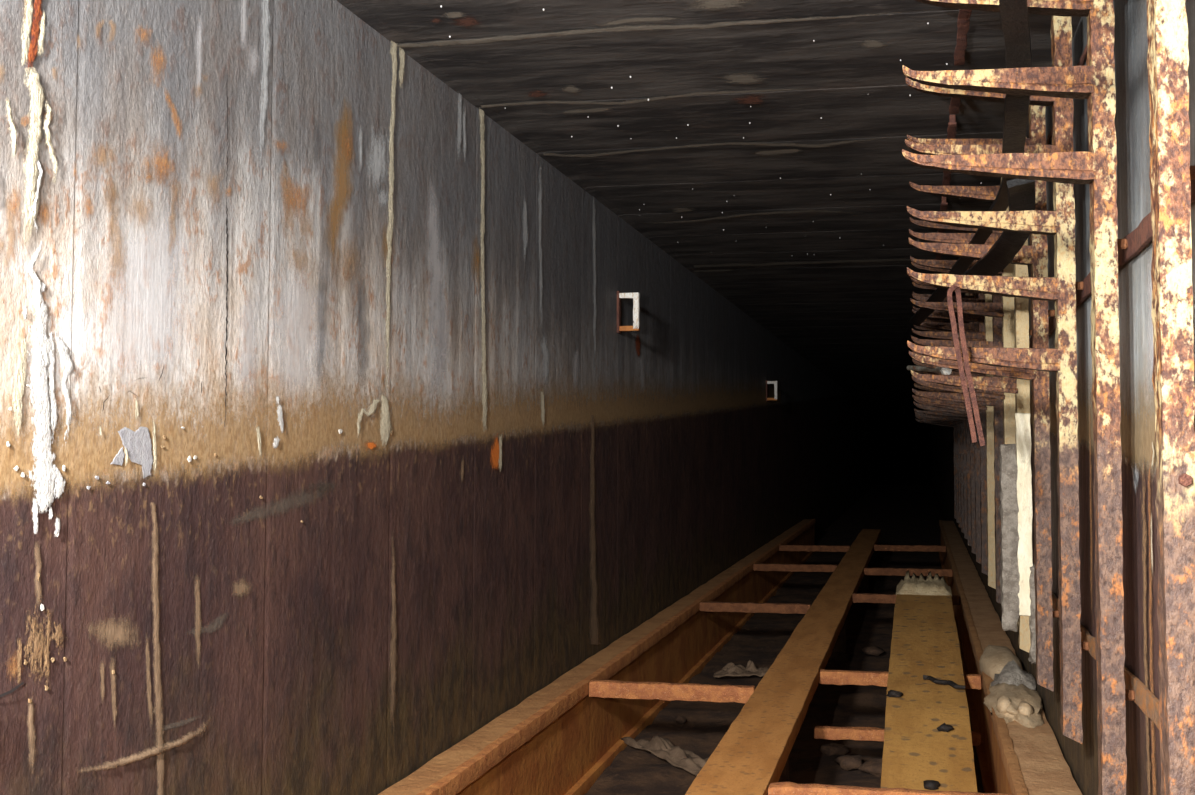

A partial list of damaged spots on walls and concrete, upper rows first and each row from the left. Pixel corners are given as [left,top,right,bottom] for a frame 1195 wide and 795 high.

corrosion [21,0,45,67]
corrosion [330,111,352,251]
water stain [0,0,932,645]
peeling [111,398,166,486]
water stain [1049,395,1057,436]
water stain [1077,390,1094,450]
water stain [1120,389,1157,487]
water stain [89,502,165,795]
water stain [194,577,225,661]
water stain [896,570,952,596]